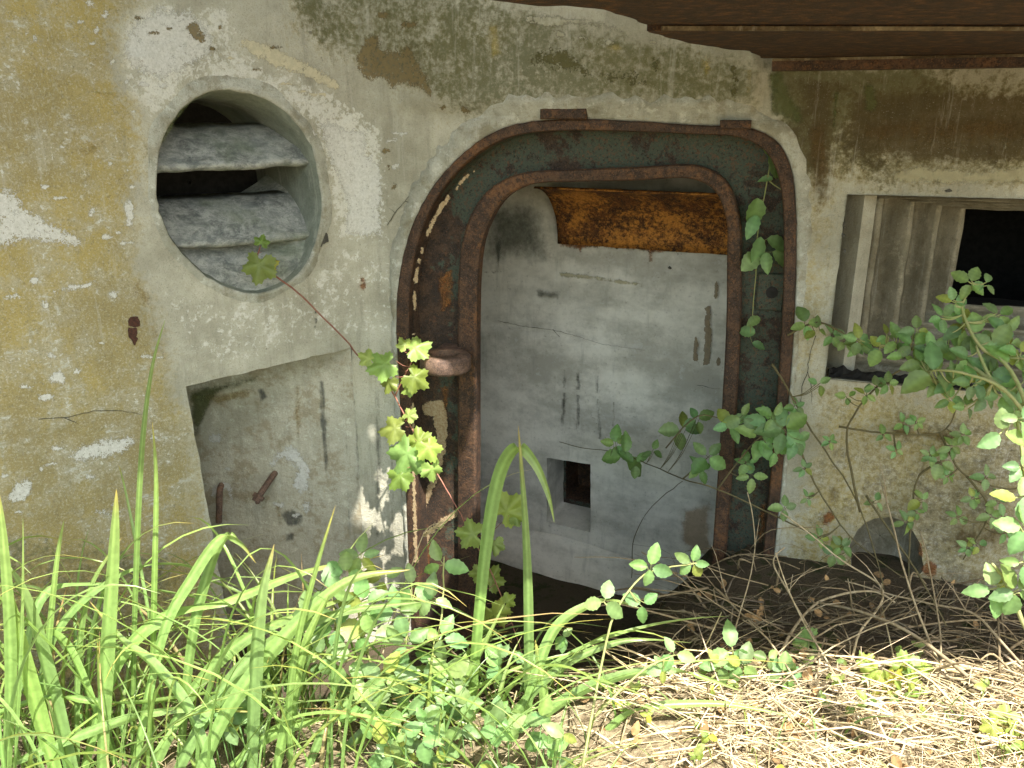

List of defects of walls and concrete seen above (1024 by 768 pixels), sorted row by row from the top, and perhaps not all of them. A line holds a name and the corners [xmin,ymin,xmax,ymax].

peeling [110,6,222,88]
peeling [356,35,432,97]
water stain [894,167,1024,192]
peeling [0,188,81,249]
peeling [412,171,475,311]
rust [128,316,140,345]
crack [42,410,138,424]